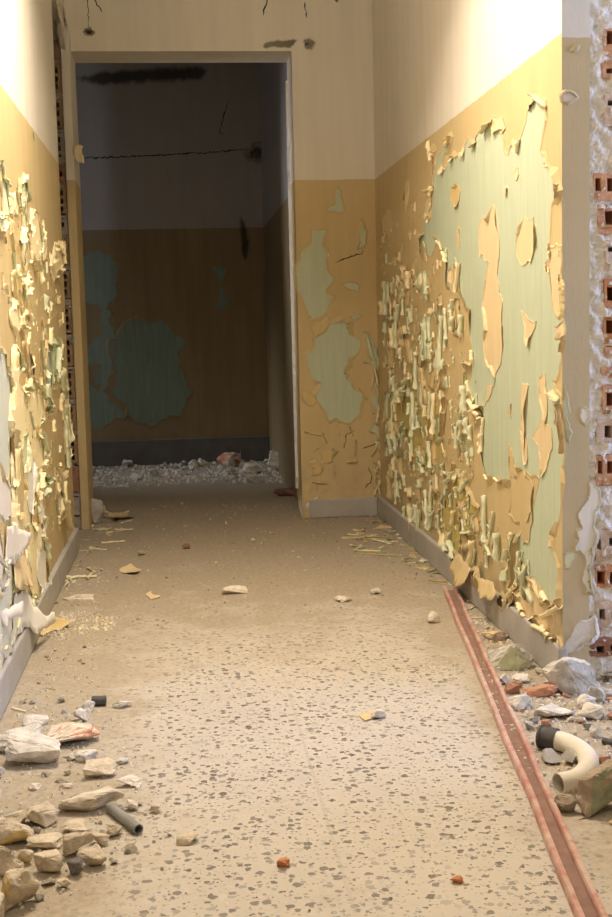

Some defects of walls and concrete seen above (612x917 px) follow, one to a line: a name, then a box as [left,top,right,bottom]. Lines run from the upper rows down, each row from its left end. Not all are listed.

crack [86,0,102,28]
crack [84,101,255,160]
peeling [0,0,84,671]
peeling [83,249,195,431]
peeling [285,0,612,679]